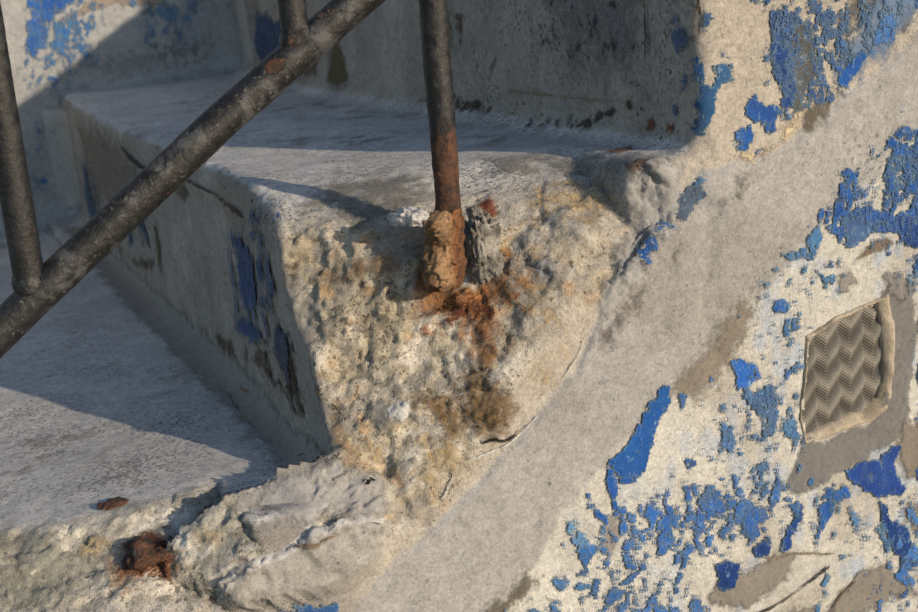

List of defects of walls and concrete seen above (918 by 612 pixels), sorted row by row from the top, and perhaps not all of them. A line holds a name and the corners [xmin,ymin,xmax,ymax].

peeling [17,0,207,104]
peeling [691,4,715,32]
peeling [680,50,735,139]
peeling [733,0,918,156]
corrosion [475,198,497,217]
corrosion [416,208,538,367]
spalling [223,163,707,539]
peeling [527,109,918,612]
corrosion [104,531,178,592]
spalling [0,479,340,612]
crack [762,552,835,612]
crack [831,581,856,612]